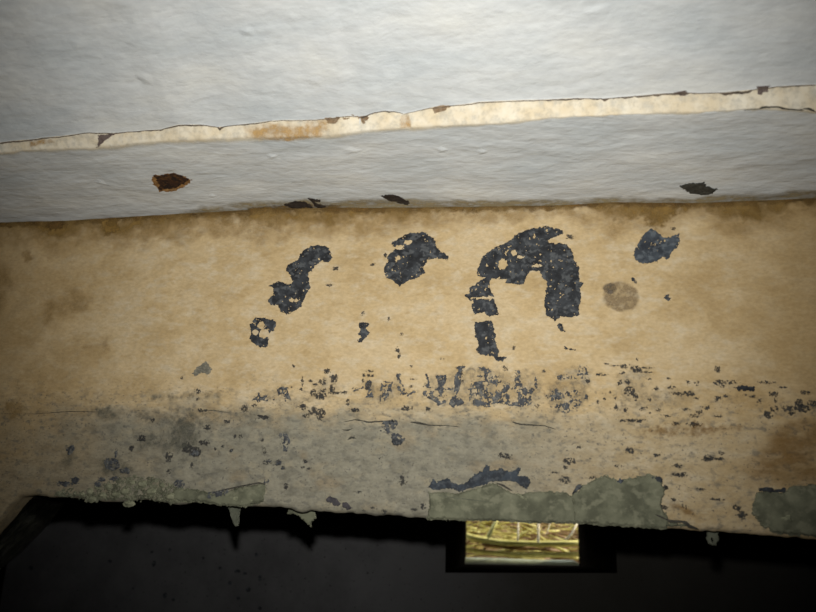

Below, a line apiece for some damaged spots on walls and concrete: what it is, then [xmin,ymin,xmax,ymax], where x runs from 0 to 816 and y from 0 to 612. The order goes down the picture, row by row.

crack [0,85,816,144]
rust [151,173,192,192]
peeling [284,198,326,209]
peeling [382,194,410,205]
peeling [680,182,718,195]
peeling [633,227,680,264]
water stain [604,277,637,311]
peeling [241,226,584,421]
peeling [192,361,212,376]
peeling [165,425,233,488]
peeling [429,452,531,492]
peeling [326,496,352,510]